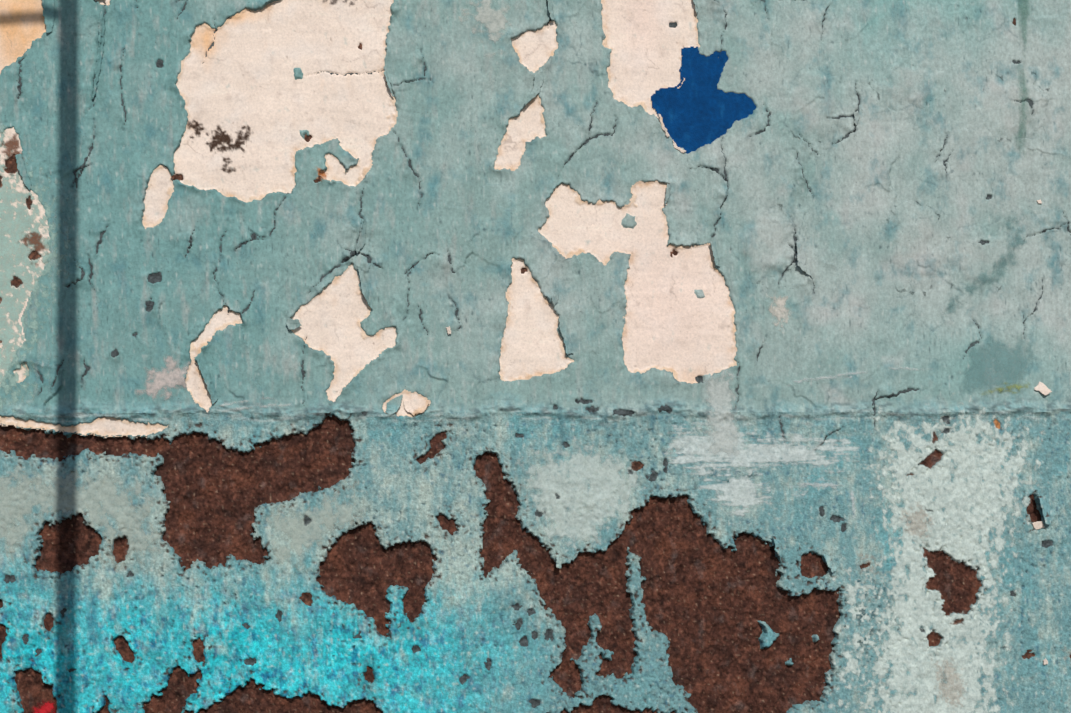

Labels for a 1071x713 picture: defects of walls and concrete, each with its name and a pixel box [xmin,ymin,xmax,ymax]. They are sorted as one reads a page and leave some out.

flaking render [0,126,355,577]
crack [213,192,288,317]
peeling [142,0,398,229]
crack [309,188,455,335]
crack [558,102,616,177]
peeling [538,180,737,384]
peeling [601,0,756,154]
crack [690,138,729,237]
crack [796,83,863,196]
crack [870,388,919,427]
flaking render [299,522,437,637]
flaking render [473,452,841,713]